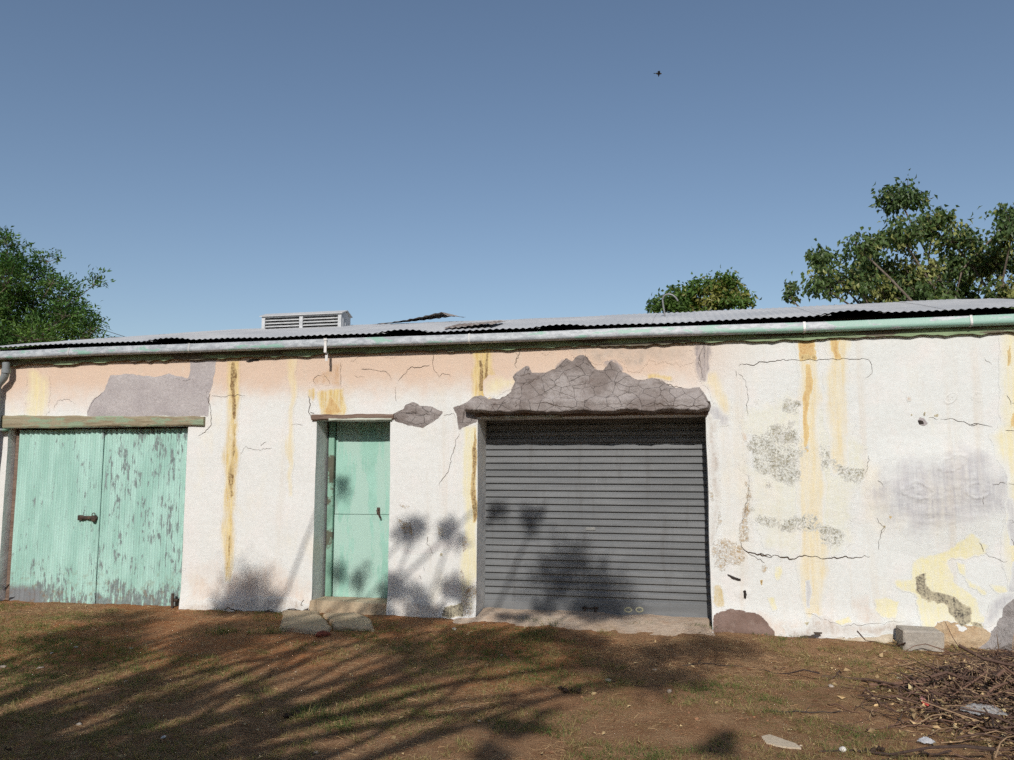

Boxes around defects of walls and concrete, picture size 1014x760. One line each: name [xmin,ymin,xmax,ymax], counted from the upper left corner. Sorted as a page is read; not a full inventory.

water stain [708,405,730,427]
crack [739,477,882,563]
water stain [712,331,1014,628]
peeling [874,533,1008,648]
spalling [833,634,895,643]